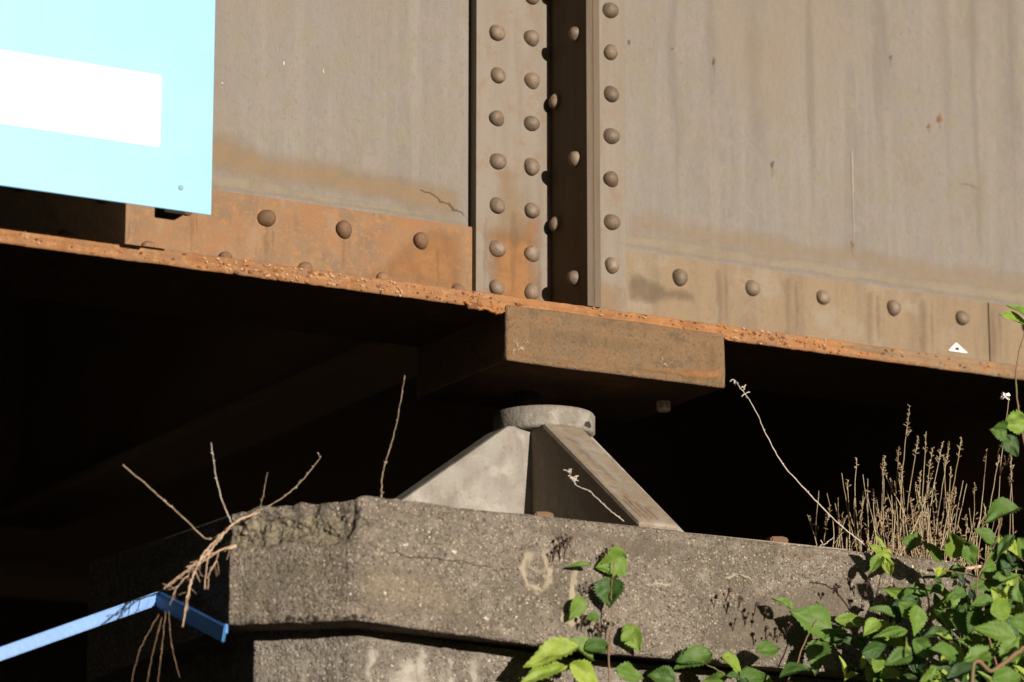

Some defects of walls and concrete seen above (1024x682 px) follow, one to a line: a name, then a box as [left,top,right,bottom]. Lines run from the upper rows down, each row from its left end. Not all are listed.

corrosion [197,224,536,315]
corrosion [717,324,869,356]